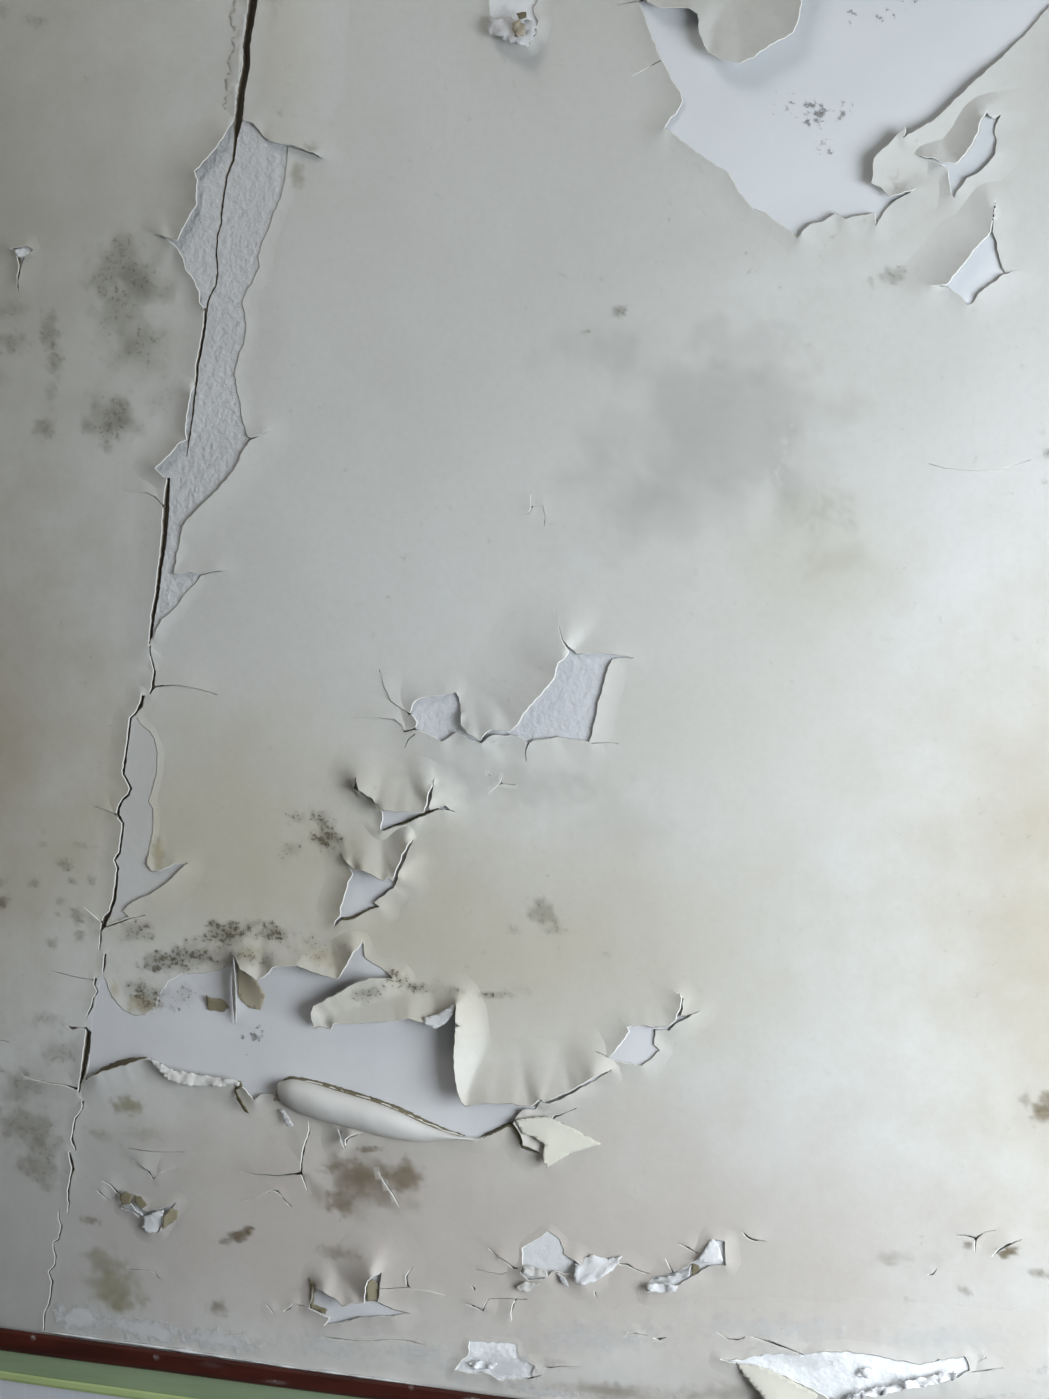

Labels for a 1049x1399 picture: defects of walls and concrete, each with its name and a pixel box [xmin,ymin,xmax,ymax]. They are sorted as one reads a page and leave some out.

spalling [476,0,552,59]
peeling [601,0,1049,325]
peeling [133,101,348,648]
crack [14,0,273,1335]
peeling [81,580,720,1182]
damp [128,919,285,1011]
peeling [114,1190,188,1243]
peeling [506,1223,622,1301]
peeling [635,1225,741,1306]
peeling [444,1335,546,1394]
peeling [708,1339,981,1399]